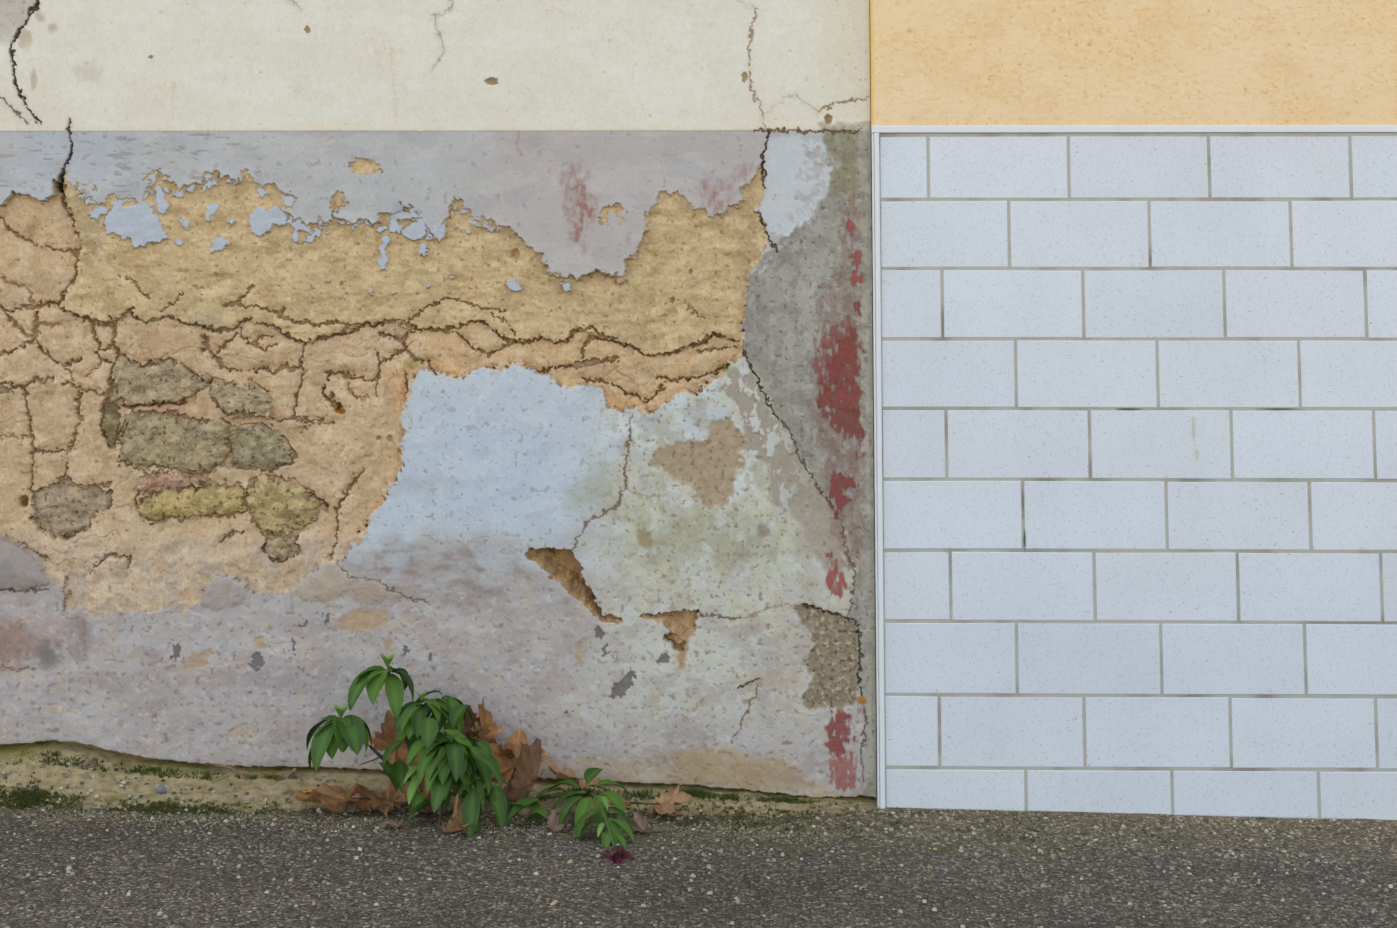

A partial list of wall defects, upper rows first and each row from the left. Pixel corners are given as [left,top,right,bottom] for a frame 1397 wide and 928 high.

peeling [0,0,39,47]
crack [0,0,73,193]
crack [432,0,454,71]
crack [738,0,869,253]
spalling [0,158,771,619]
crack [570,417,667,552]
crack [697,351,869,783]